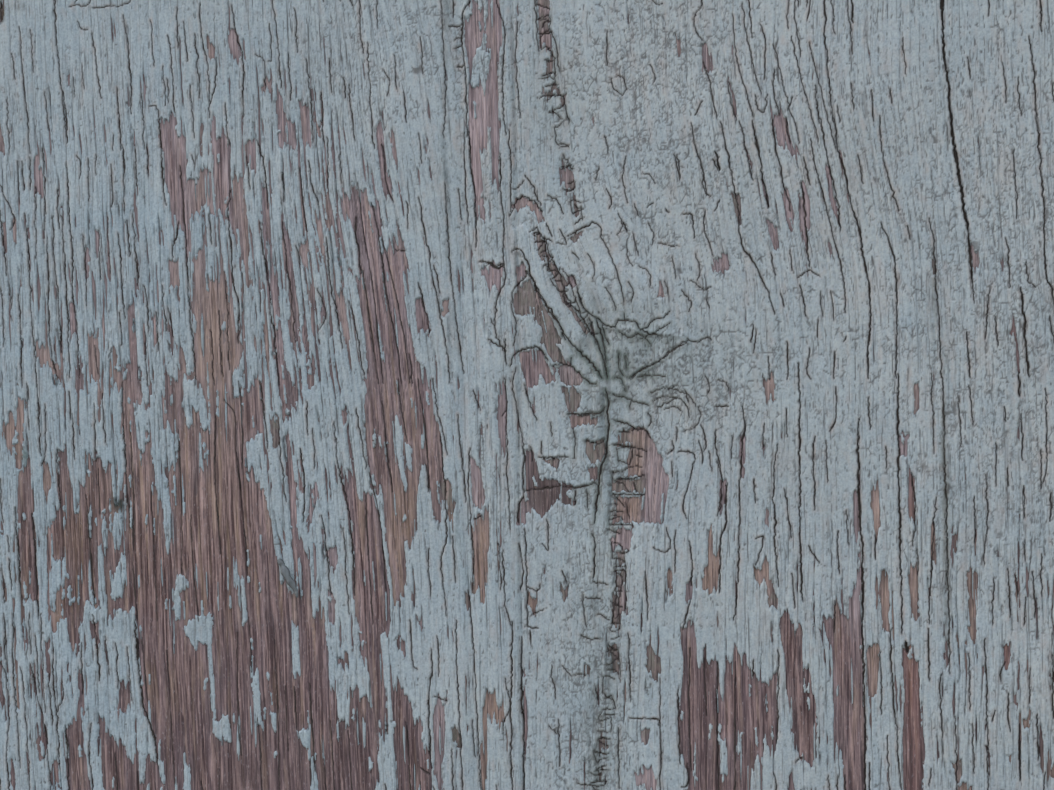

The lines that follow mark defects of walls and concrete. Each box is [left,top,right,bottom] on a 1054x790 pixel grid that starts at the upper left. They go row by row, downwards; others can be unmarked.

peeling [511,195,595,336]
peeling [0,7,468,790]
peeling [465,424,502,611]
peeling [441,250,598,479]
peeling [516,450,576,526]
peeling [586,426,678,717]
crack [481,0,872,790]
peeling [678,469,944,790]
peeling [899,431,918,525]
peeling [942,526,984,719]
peeling [1009,514,1054,639]
peeling [477,690,508,790]